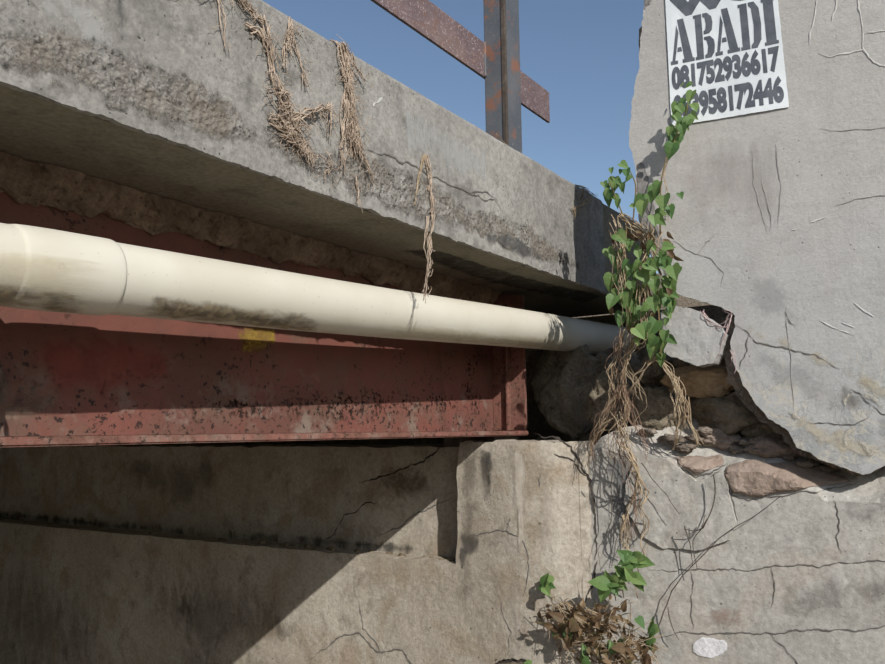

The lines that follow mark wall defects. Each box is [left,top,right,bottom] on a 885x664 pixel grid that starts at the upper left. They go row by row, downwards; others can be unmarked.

crack [809,0,885,66]
crack [366,149,501,209]
corrosion [216,399,269,418]
corrosion [288,392,455,419]
crack [324,445,452,541]
crack [539,434,598,603]
flaking render [676,454,849,497]
crack [466,520,529,593]
crack [657,457,885,664]
crack [307,606,412,664]